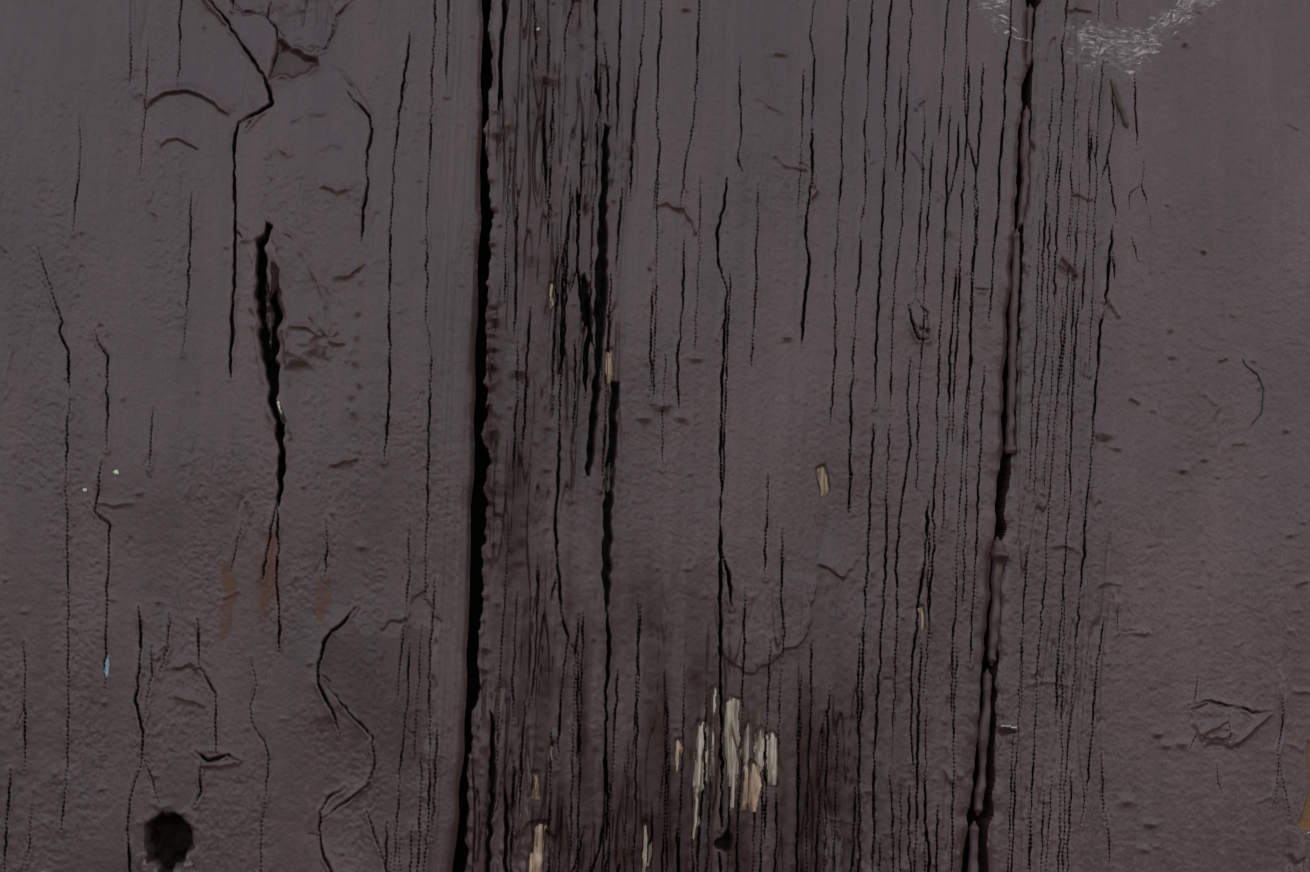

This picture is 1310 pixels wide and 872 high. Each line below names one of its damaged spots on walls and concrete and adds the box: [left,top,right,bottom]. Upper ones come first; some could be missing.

crack [129,0,279,375]
crack [4,646,31,870]
crack [39,254,229,872]
crack [311,0,449,872]
peeling [529,824,550,872]
peeling [610,566,846,840]